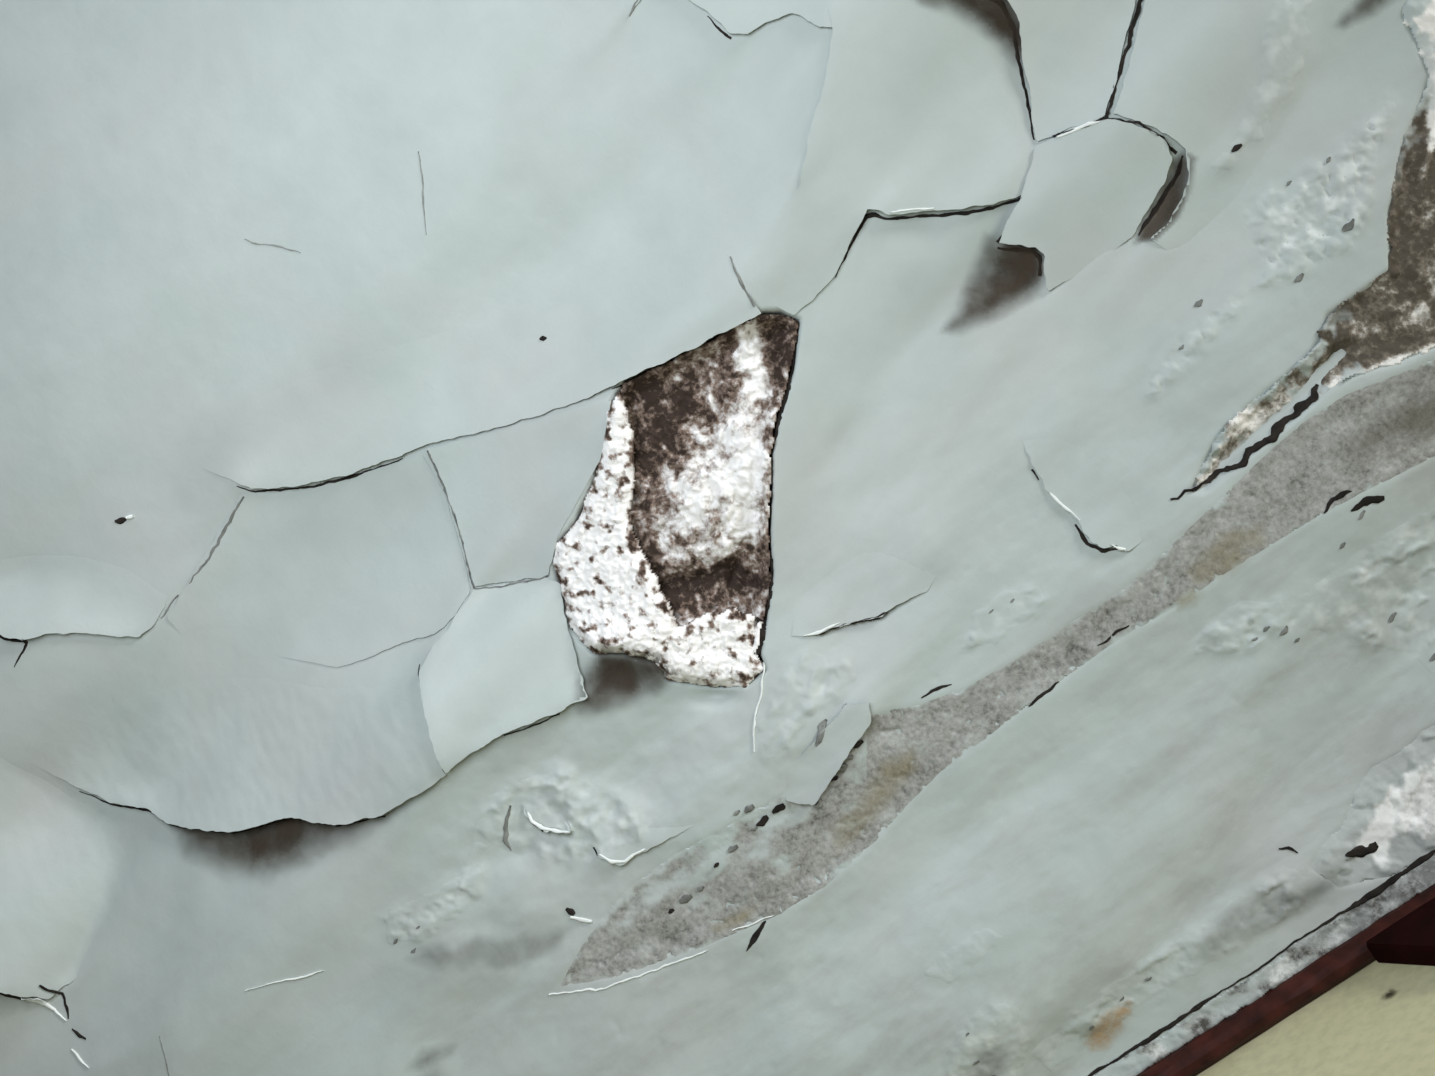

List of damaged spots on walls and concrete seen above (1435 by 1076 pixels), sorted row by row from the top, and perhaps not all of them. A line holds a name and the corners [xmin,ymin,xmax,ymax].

crack [1052,0,1177,154]
spalling [0,0,1343,834]
crack [14,639,28,667]
crack [161,496,244,618]
crack [427,450,548,589]
crack [818,612,887,635]
crack [921,684,952,698]
spalling [561,0,1435,986]
crack [1028,681,1059,707]
peeling [0,758,135,1000]
crack [746,921,766,951]
spalling [1093,725,1435,1076]